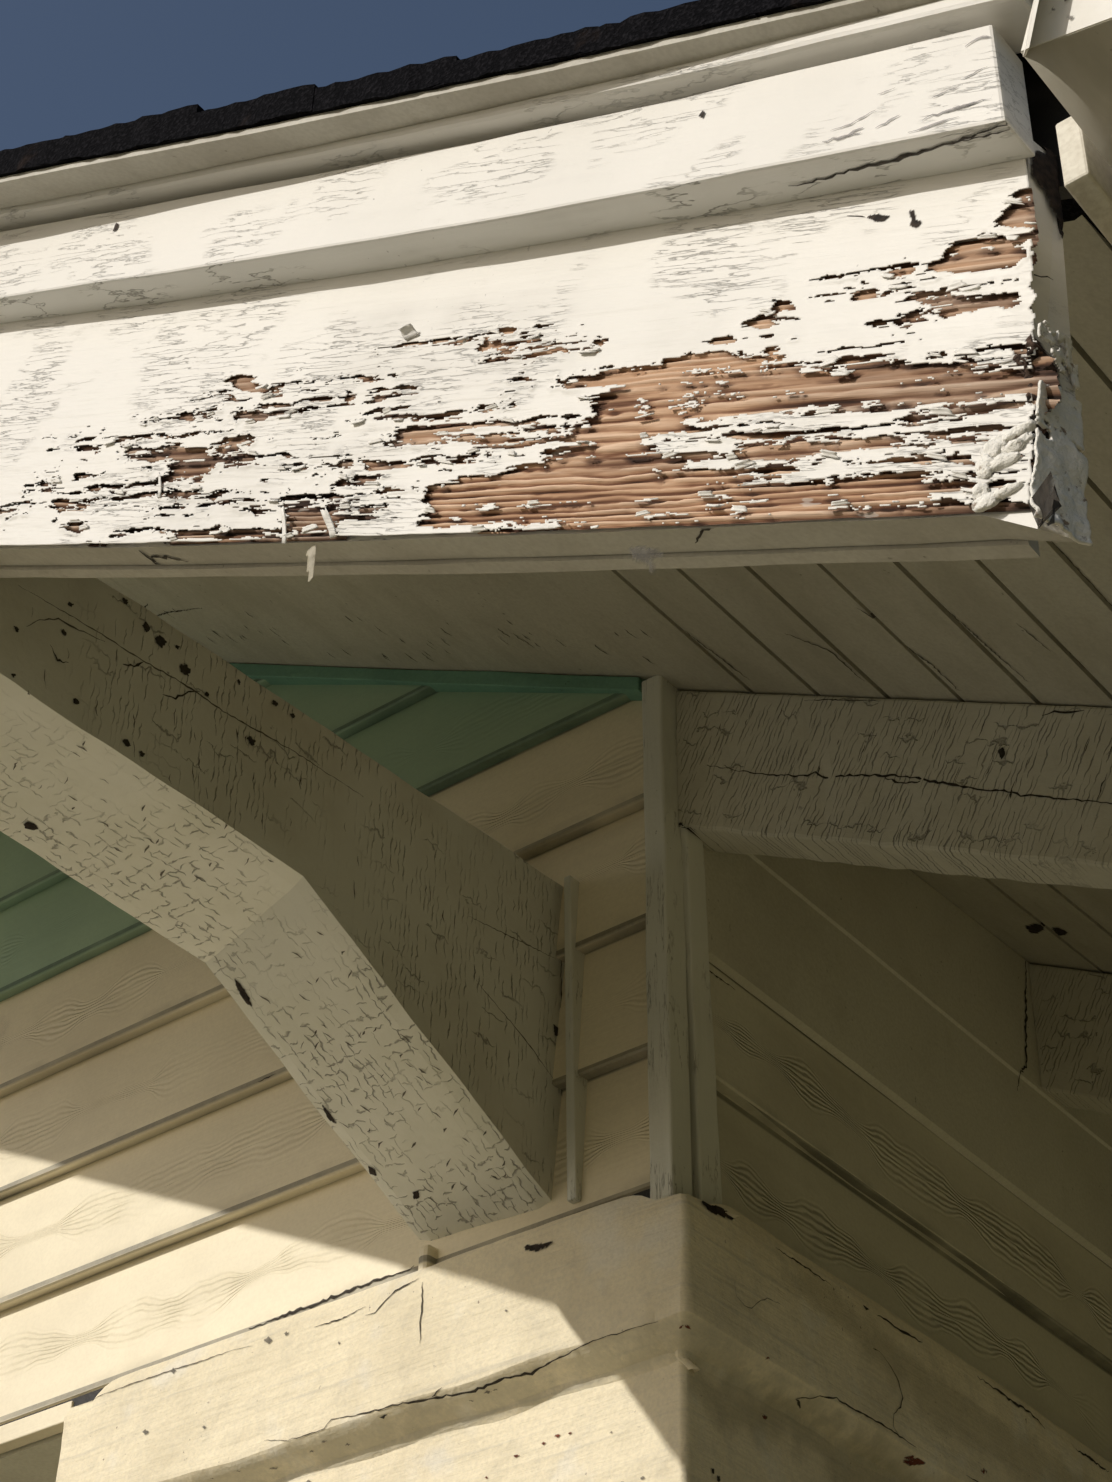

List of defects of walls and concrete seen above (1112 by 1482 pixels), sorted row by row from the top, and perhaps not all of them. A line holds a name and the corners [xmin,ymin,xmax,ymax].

crack [791,123,1010,186]
peeling [0,188,1093,547]
crack [685,702,1112,851]
crack [316,1279,423,1340]
crack [269,1322,655,1441]